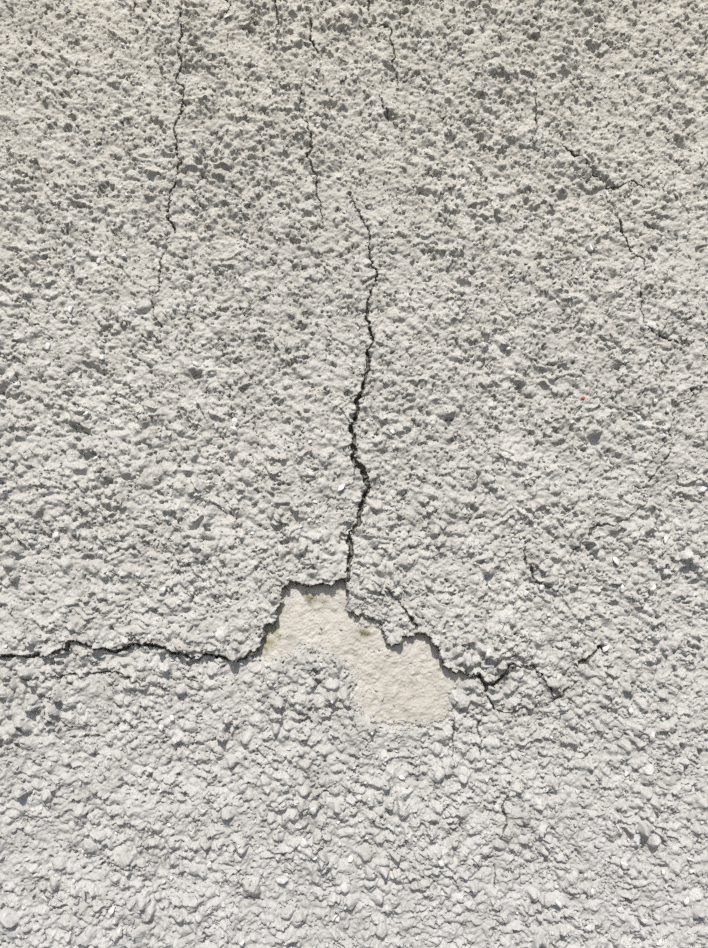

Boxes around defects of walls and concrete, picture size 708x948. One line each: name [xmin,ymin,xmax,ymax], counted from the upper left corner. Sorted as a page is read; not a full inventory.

crack [150,0,185,356]
spalling [308,0,708,222]
crack [560,143,678,343]
crack [330,190,379,582]
crack [0,637,260,687]
spalling [336,484,408,538]
spalling [215,556,554,779]
crack [386,588,418,629]
crack [523,541,564,598]